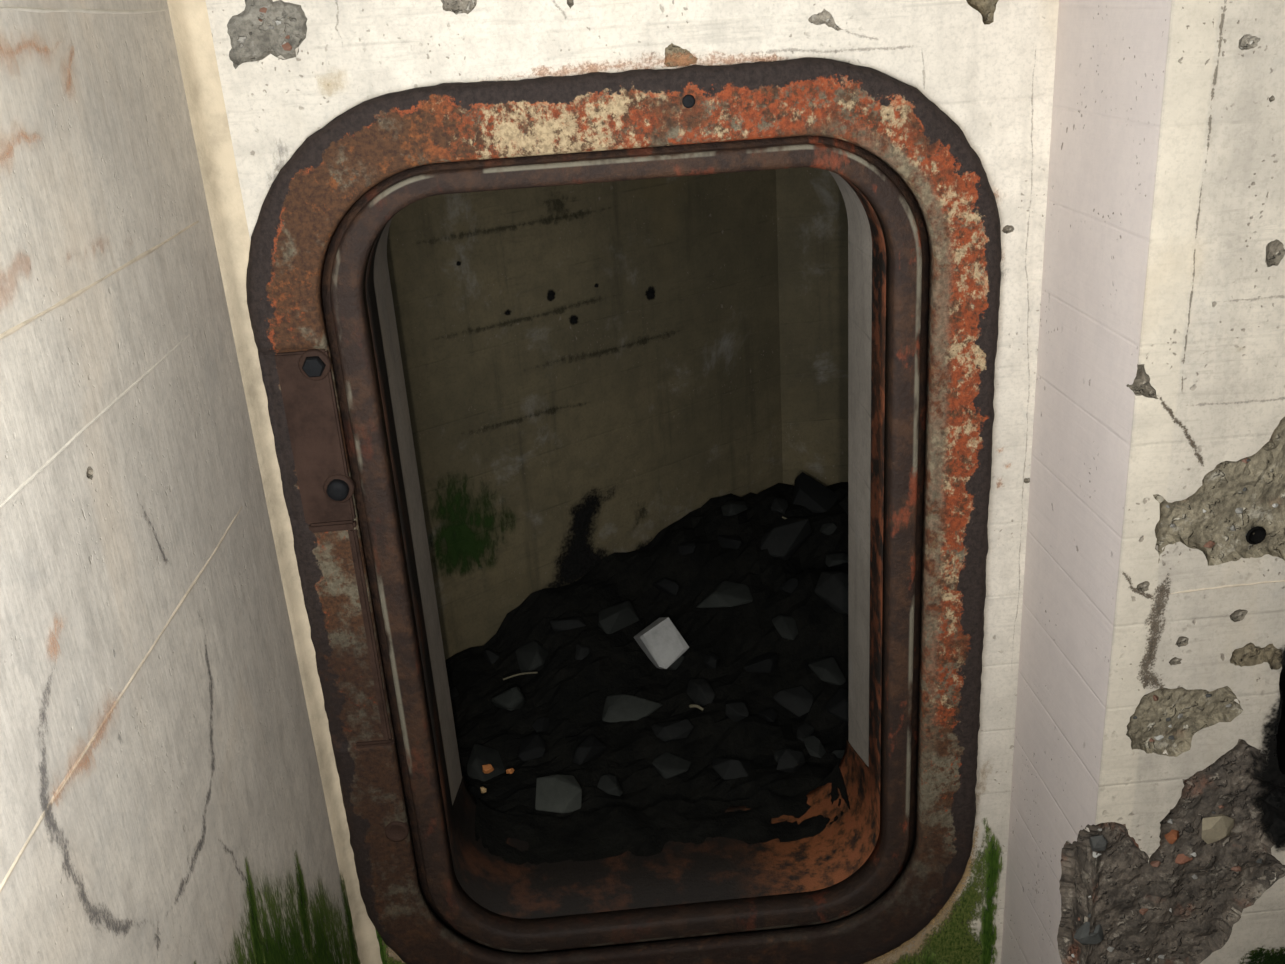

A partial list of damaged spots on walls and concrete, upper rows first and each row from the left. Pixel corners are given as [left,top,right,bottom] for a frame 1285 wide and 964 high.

spalling [227,0,307,69]
spalling [966,0,998,25]
crack [1160,2,1226,466]
spalling [1153,417,1285,566]
leakage [39,678,132,936]
leakage [176,645,215,901]
leakage [224,846,266,964]
leakage [340,876,361,964]
rust [864,831,978,964]
leakage [979,818,1002,964]
spalling [1057,739,1285,964]
spalling [1126,686,1243,757]